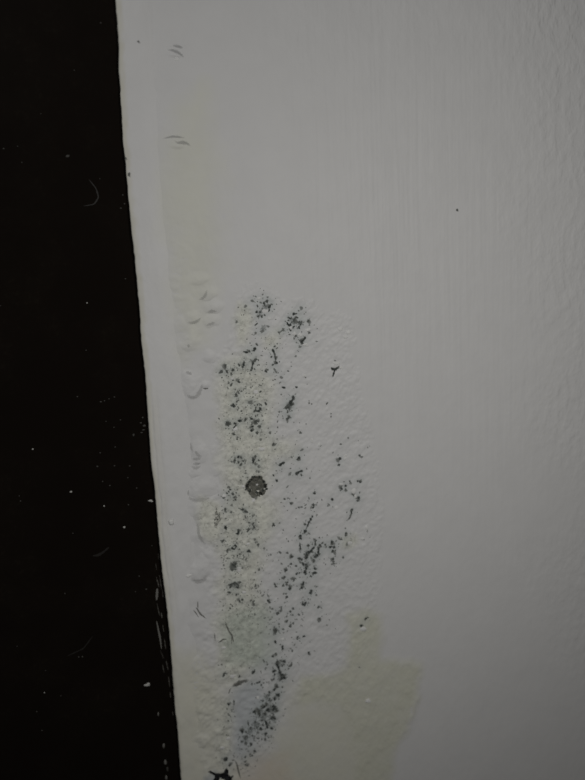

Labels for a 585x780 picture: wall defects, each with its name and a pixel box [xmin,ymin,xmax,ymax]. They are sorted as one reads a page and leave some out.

damp [189,287,427,780]